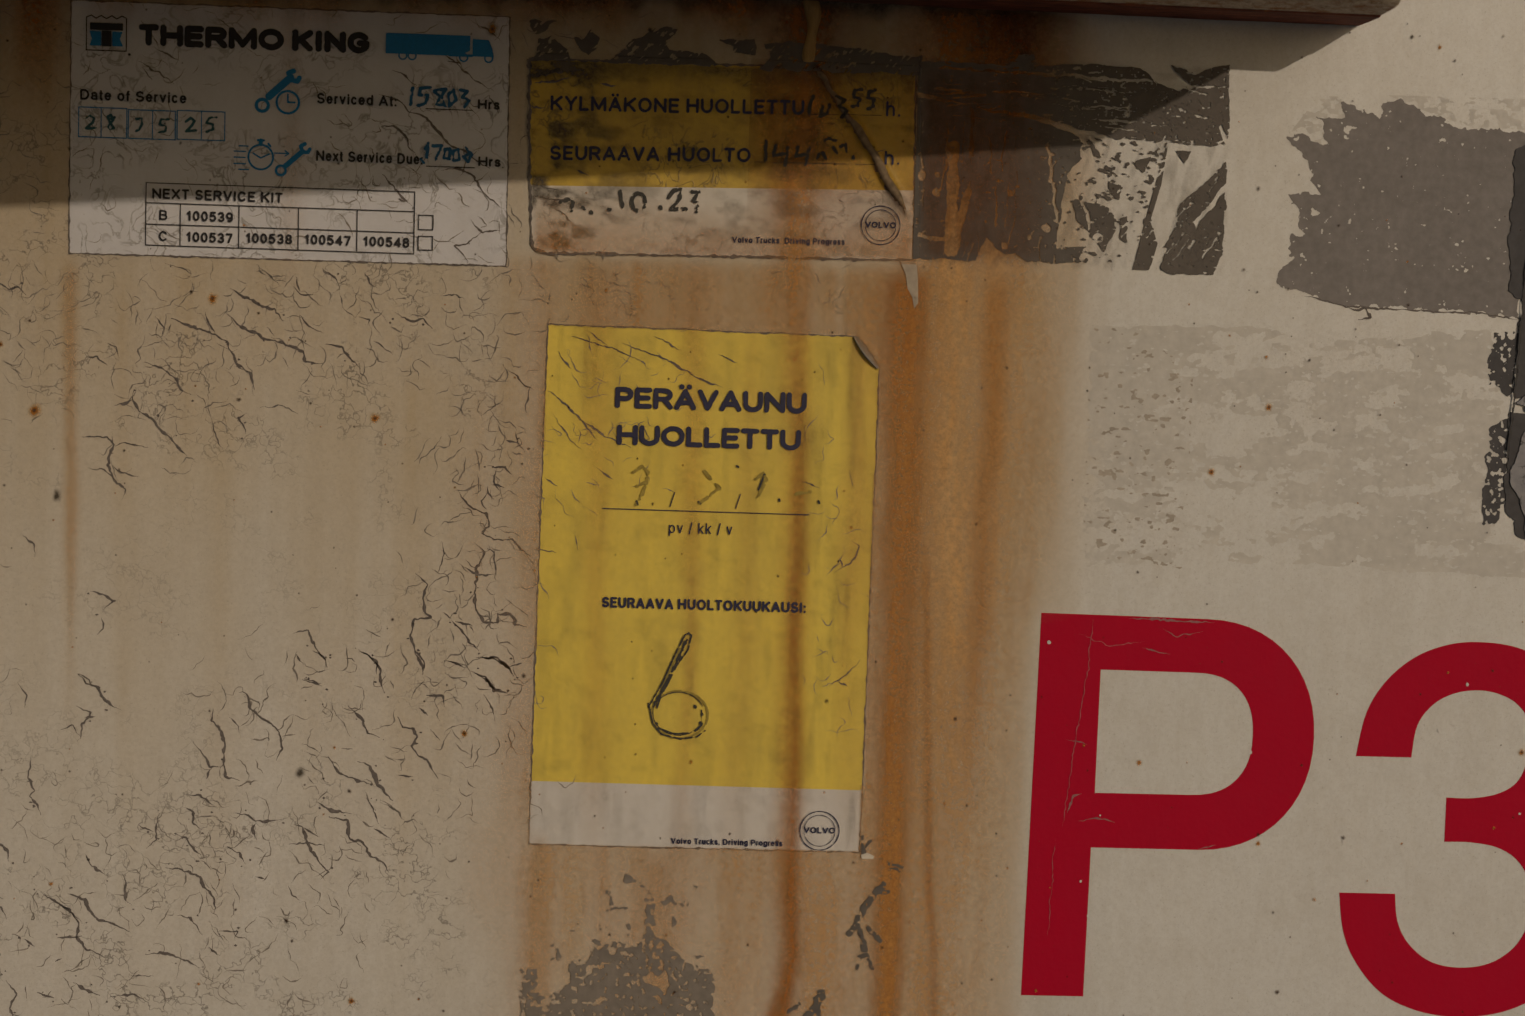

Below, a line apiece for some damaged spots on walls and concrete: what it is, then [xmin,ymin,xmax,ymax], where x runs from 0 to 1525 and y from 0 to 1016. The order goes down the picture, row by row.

peeling [1071,139,1227,275]
crack [0,0,737,1016]
crack [798,365,880,733]